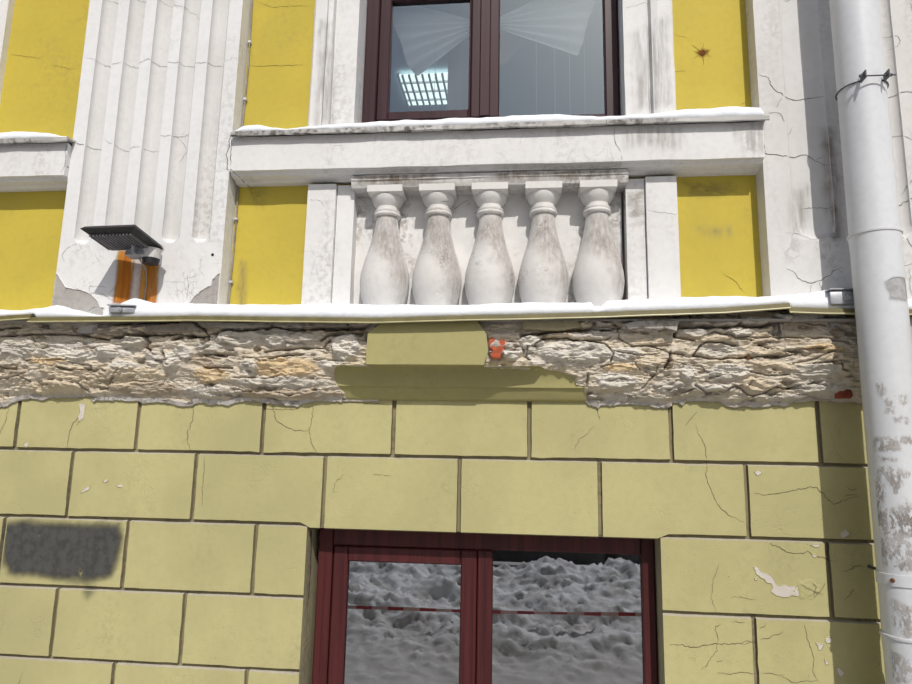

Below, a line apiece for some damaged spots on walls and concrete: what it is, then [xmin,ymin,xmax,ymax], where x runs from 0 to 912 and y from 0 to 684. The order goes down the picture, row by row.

crack [759,74,824,165]
flaking render [52,273,105,315]
flaking render [190,273,221,304]
peeling [0,394,342,421]
peeling [586,397,862,409]
crack [756,486,855,504]
peeling [875,437,912,571]
peeling [753,565,800,598]
crack [673,566,815,683]
peeling [894,600,912,637]